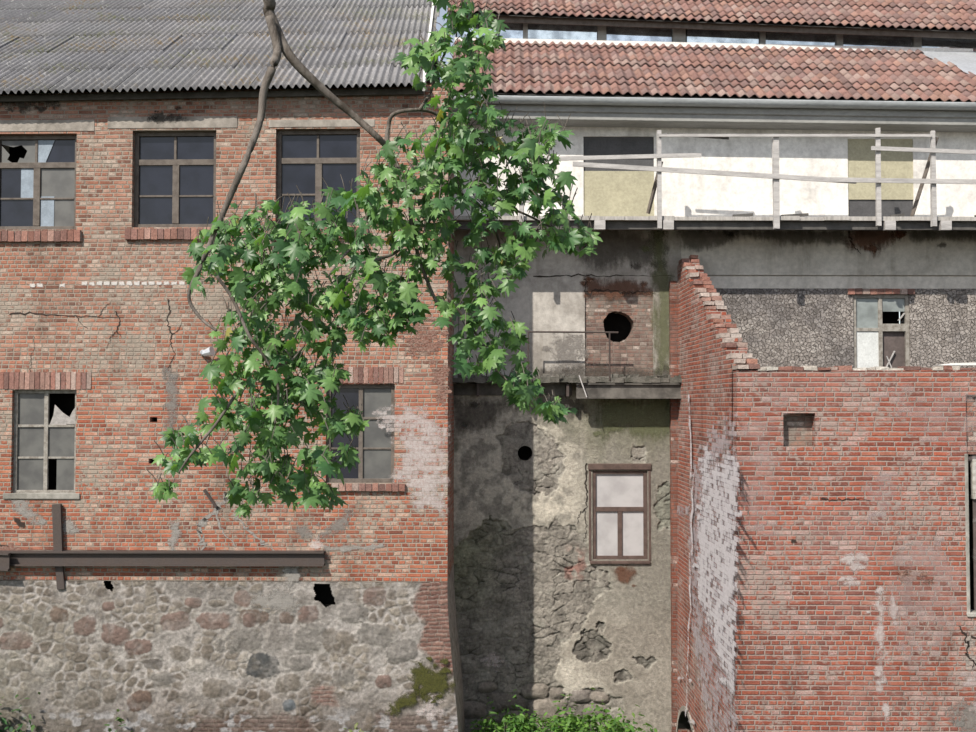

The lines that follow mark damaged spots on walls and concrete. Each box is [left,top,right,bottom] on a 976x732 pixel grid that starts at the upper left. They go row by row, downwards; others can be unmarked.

crack [9,303,123,349]
crack [164,299,182,377]
flaking render [495,421,567,496]
peeling [654,413,742,732]
flaking render [454,515,624,732]
spalling [614,668,633,683]
spalling [632,656,657,668]
crack [959,626,976,668]
water stain [416,695,445,721]